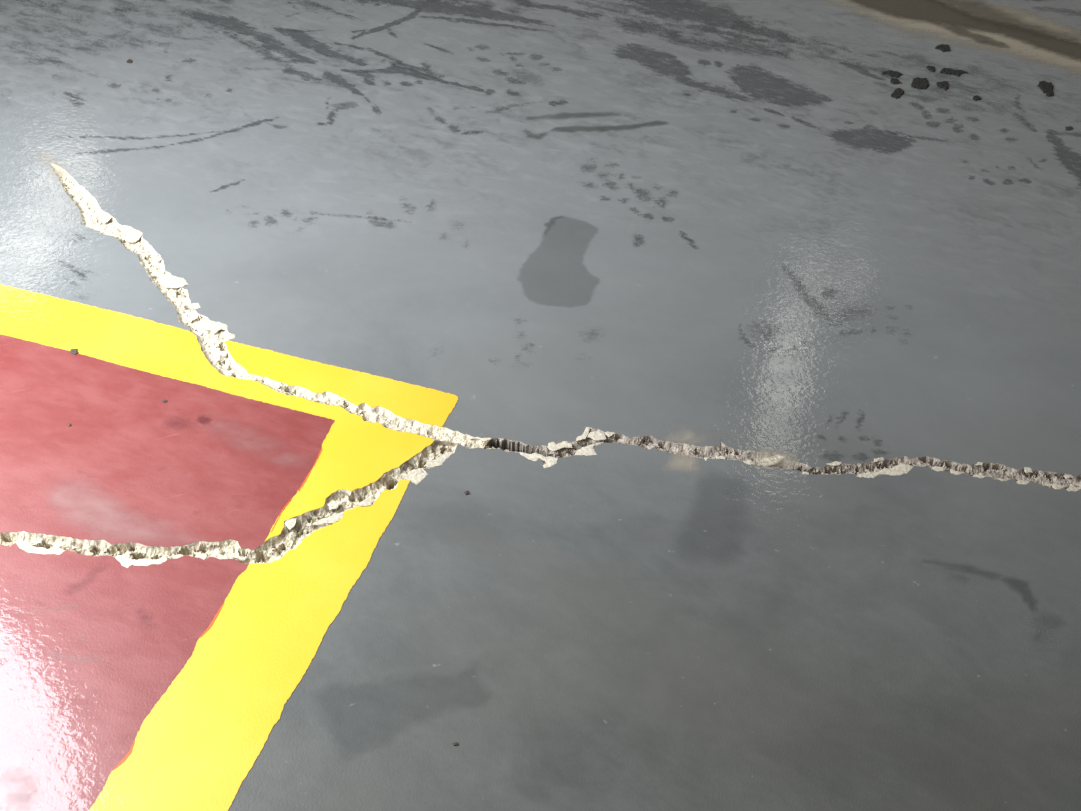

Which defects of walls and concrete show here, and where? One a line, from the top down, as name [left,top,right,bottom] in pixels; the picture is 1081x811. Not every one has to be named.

water stain [703,22,804,45]
water stain [831,0,1081,75]
crack [0,163,1081,568]